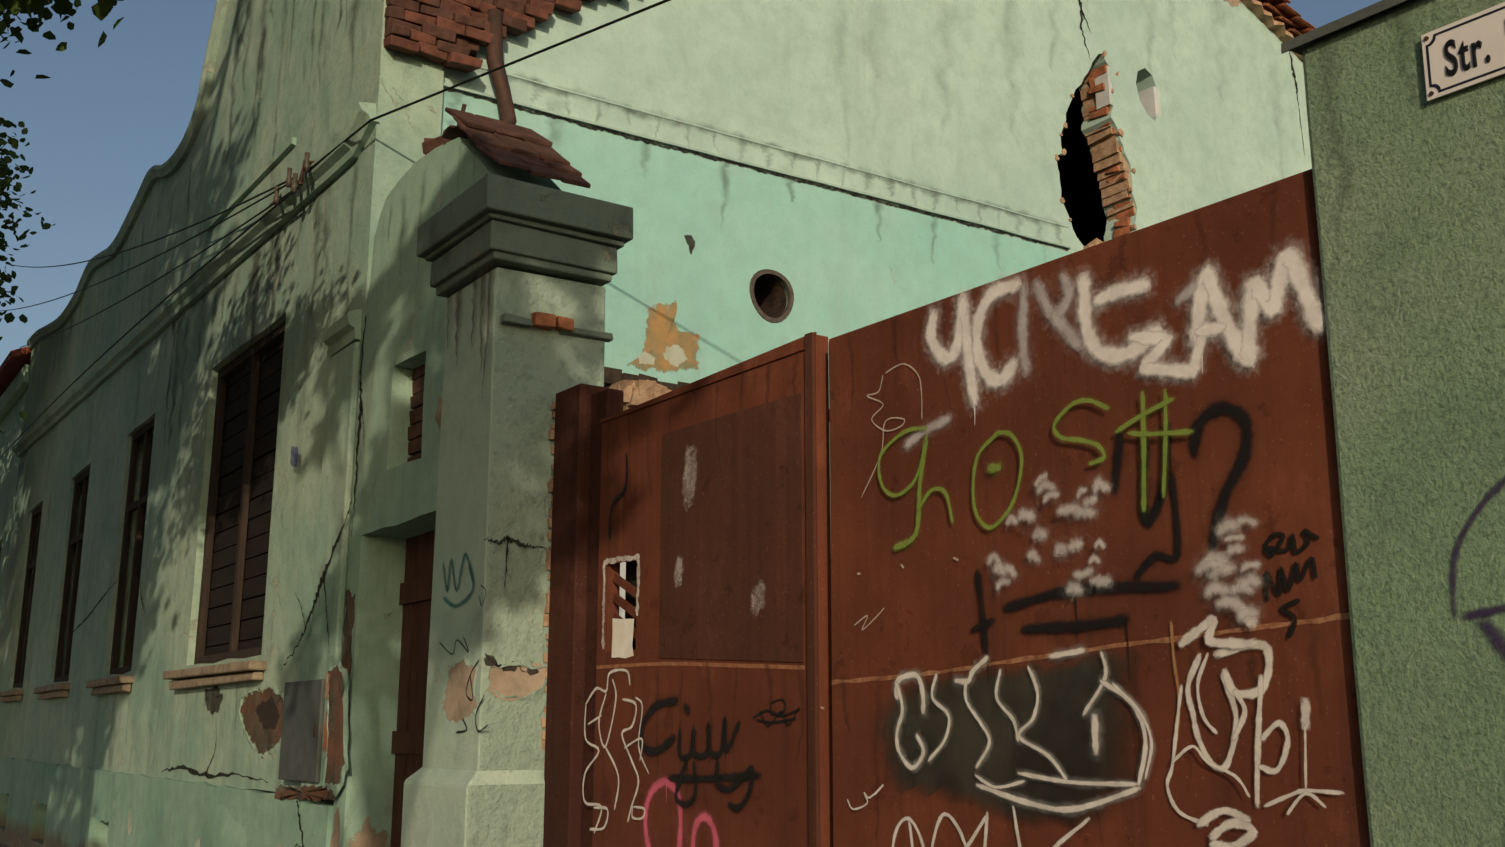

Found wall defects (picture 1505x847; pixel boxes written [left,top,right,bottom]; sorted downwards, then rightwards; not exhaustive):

crack [1079,0,1091,60]
spalling [1138,86,1161,118]
flaking render [628,302,699,373]
crack [281,316,366,670]
flaking render [441,401,556,763]
crack [162,718,304,847]
flaking render [205,681,284,761]
flaking render [274,589,355,847]